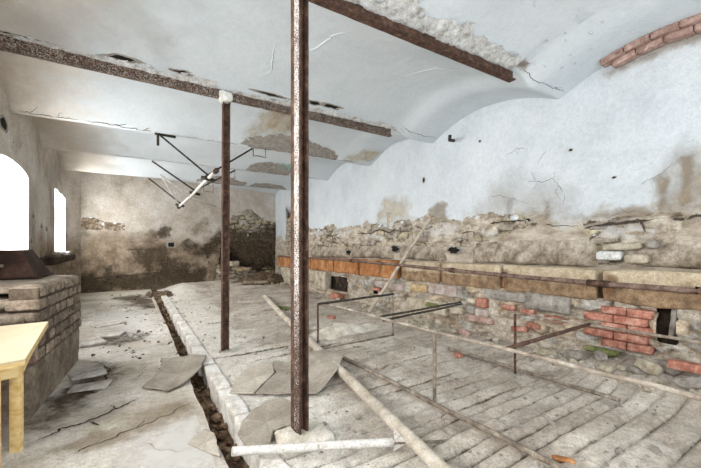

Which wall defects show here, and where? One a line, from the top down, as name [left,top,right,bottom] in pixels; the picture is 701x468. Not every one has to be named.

flaking render [9,34,218,88]
flaking render [345,0,521,70]
crack [26,107,151,132]
flaking render [241,133,291,153]
damp [658,178,668,210]
damp [81,232,207,293]
damp [145,226,172,238]
damp [181,231,221,258]
damp [230,223,276,272]
flaking render [309,204,537,257]
flaking render [583,208,686,268]
crack [37,399,187,457]